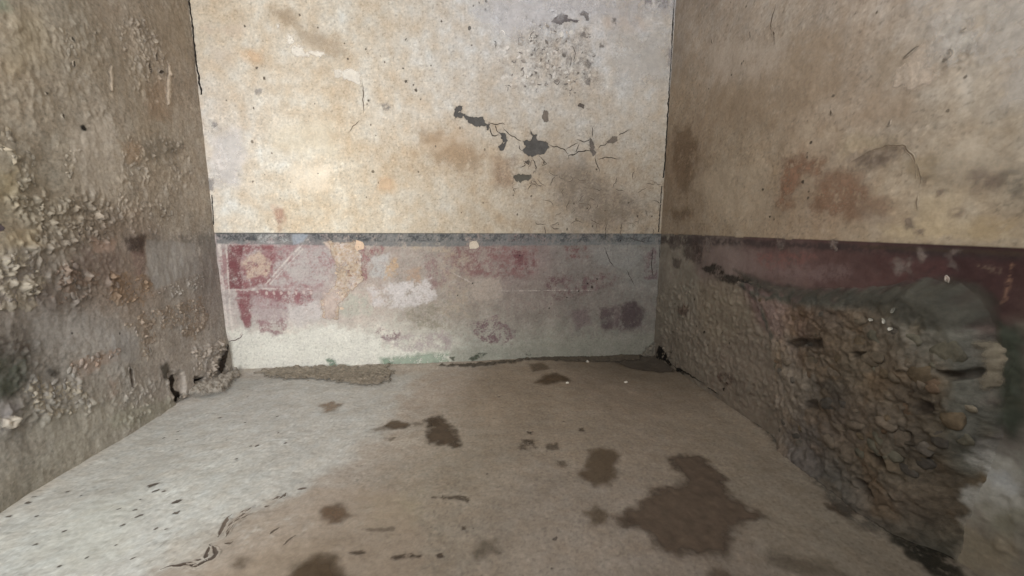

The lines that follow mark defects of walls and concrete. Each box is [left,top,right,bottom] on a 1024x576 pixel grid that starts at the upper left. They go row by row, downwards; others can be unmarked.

flaking render [452,103,551,196]
crack [488,0,676,296]
flaking render [588,135,619,170]
peeling [320,240,364,320]
damp [426,417,459,447]
damp [580,449,618,484]
damp [619,455,764,555]
flaking render [718,272,1024,561]